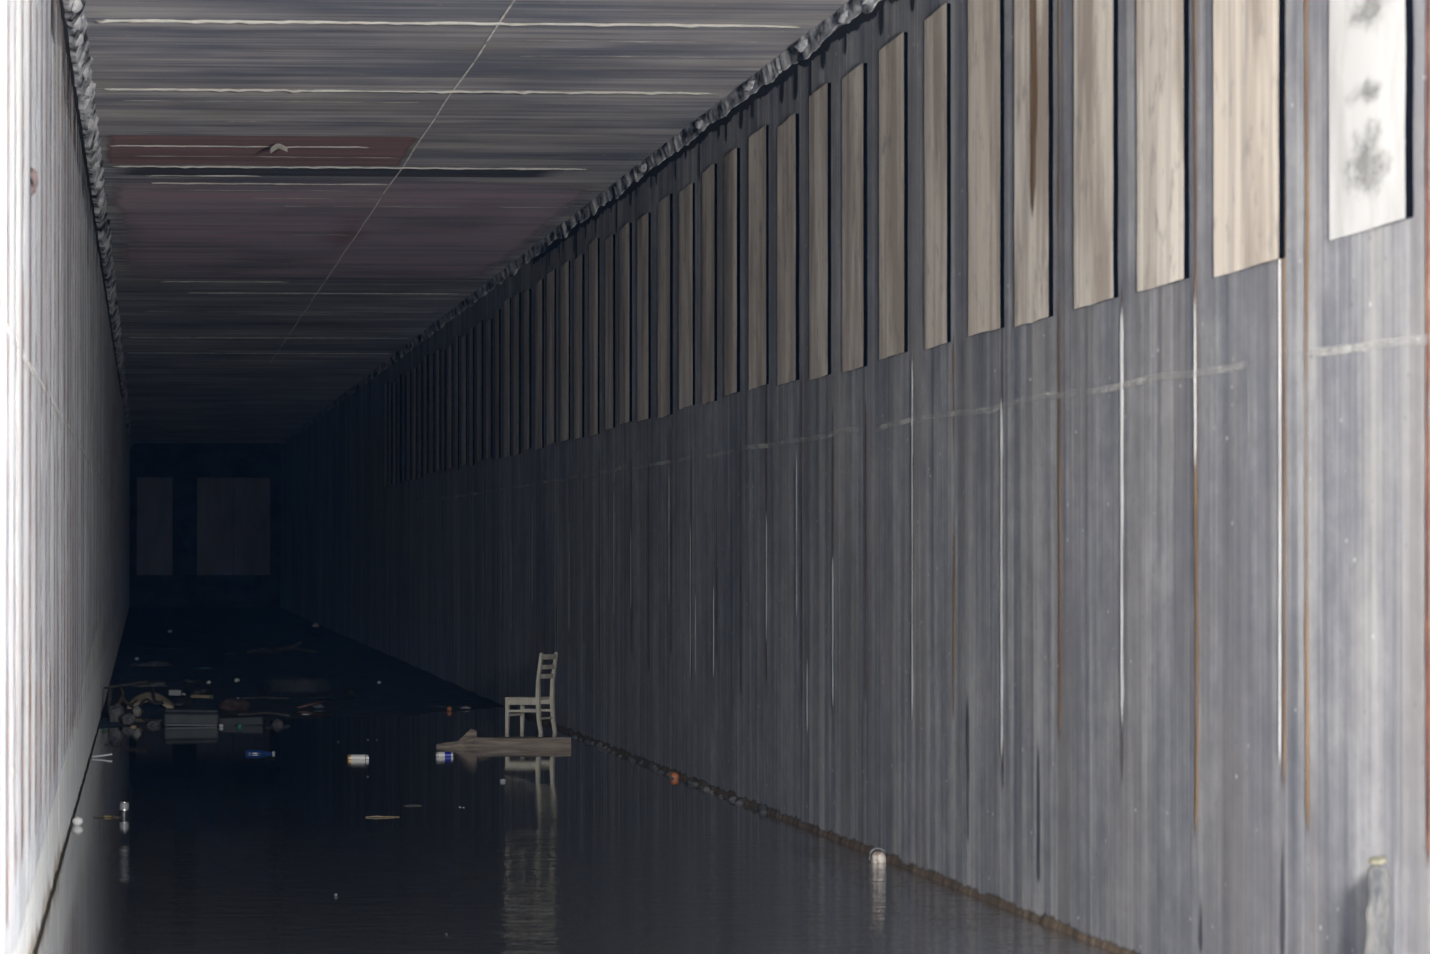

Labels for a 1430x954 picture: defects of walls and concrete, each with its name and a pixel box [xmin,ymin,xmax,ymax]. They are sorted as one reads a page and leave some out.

crack [270,0,515,363]
damp [15,624,102,954]